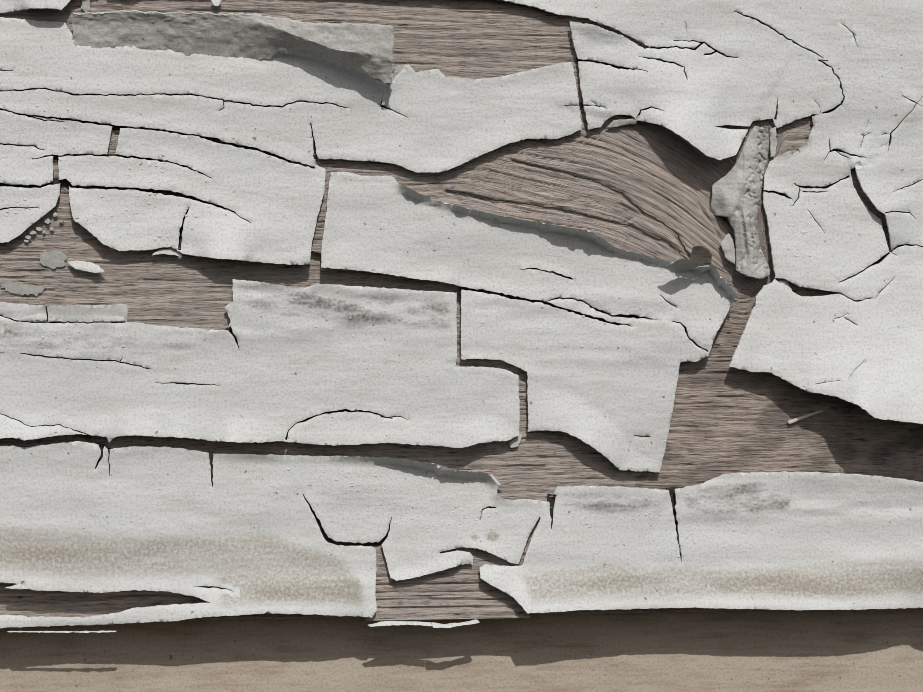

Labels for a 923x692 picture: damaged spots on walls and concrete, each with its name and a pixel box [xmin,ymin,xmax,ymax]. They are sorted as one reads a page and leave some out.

peeling [0,0,649,105]
crack [564,40,738,116]
crack [734,11,844,119]
crack [0,70,346,254]
crack [446,160,691,260]
crack [762,100,923,325]
peeling [0,109,923,508]
crack [0,352,218,386]
crack [1,414,111,476]
crack [285,409,408,440]
crack [303,494,391,546]
peeling [364,517,540,621]